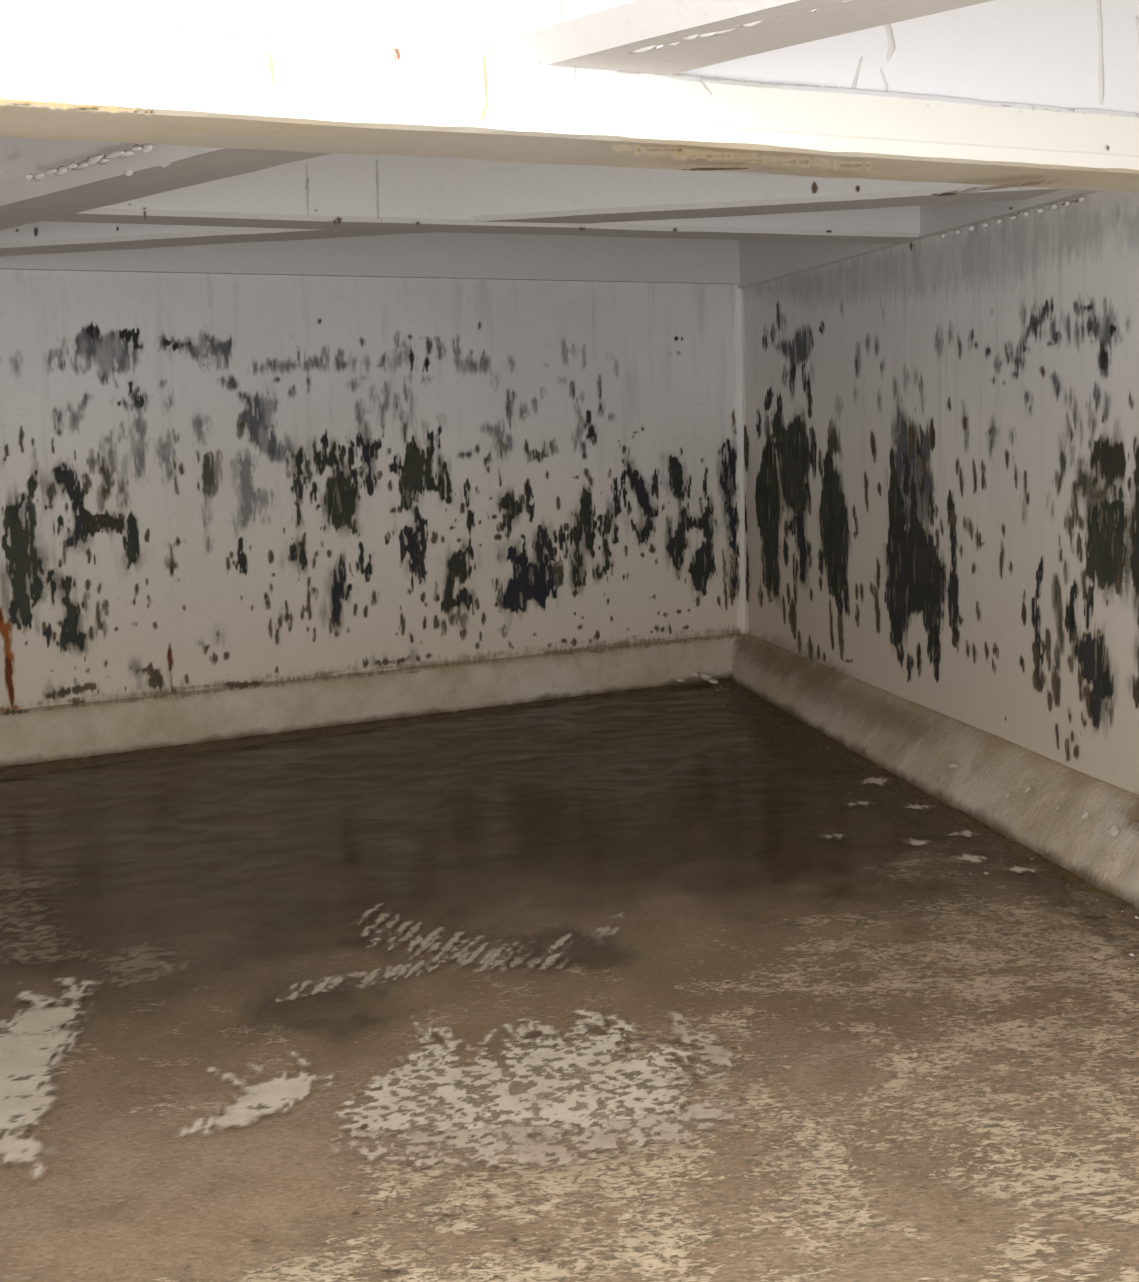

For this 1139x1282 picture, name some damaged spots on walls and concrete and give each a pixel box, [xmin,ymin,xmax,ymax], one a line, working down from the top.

leakage [4,427,34,461]
leakage [49,324,147,477]
leakage [161,334,346,526]
leakage [382,335,458,372]
leakage [459,391,554,486]
leakage [575,376,612,459]
leakage [762,303,824,397]
leakage [855,338,882,371]
leakage [936,299,1116,447]
corrosion [0,608,18,711]
leakage [117,654,496,703]
leakage [728,678,1132,909]